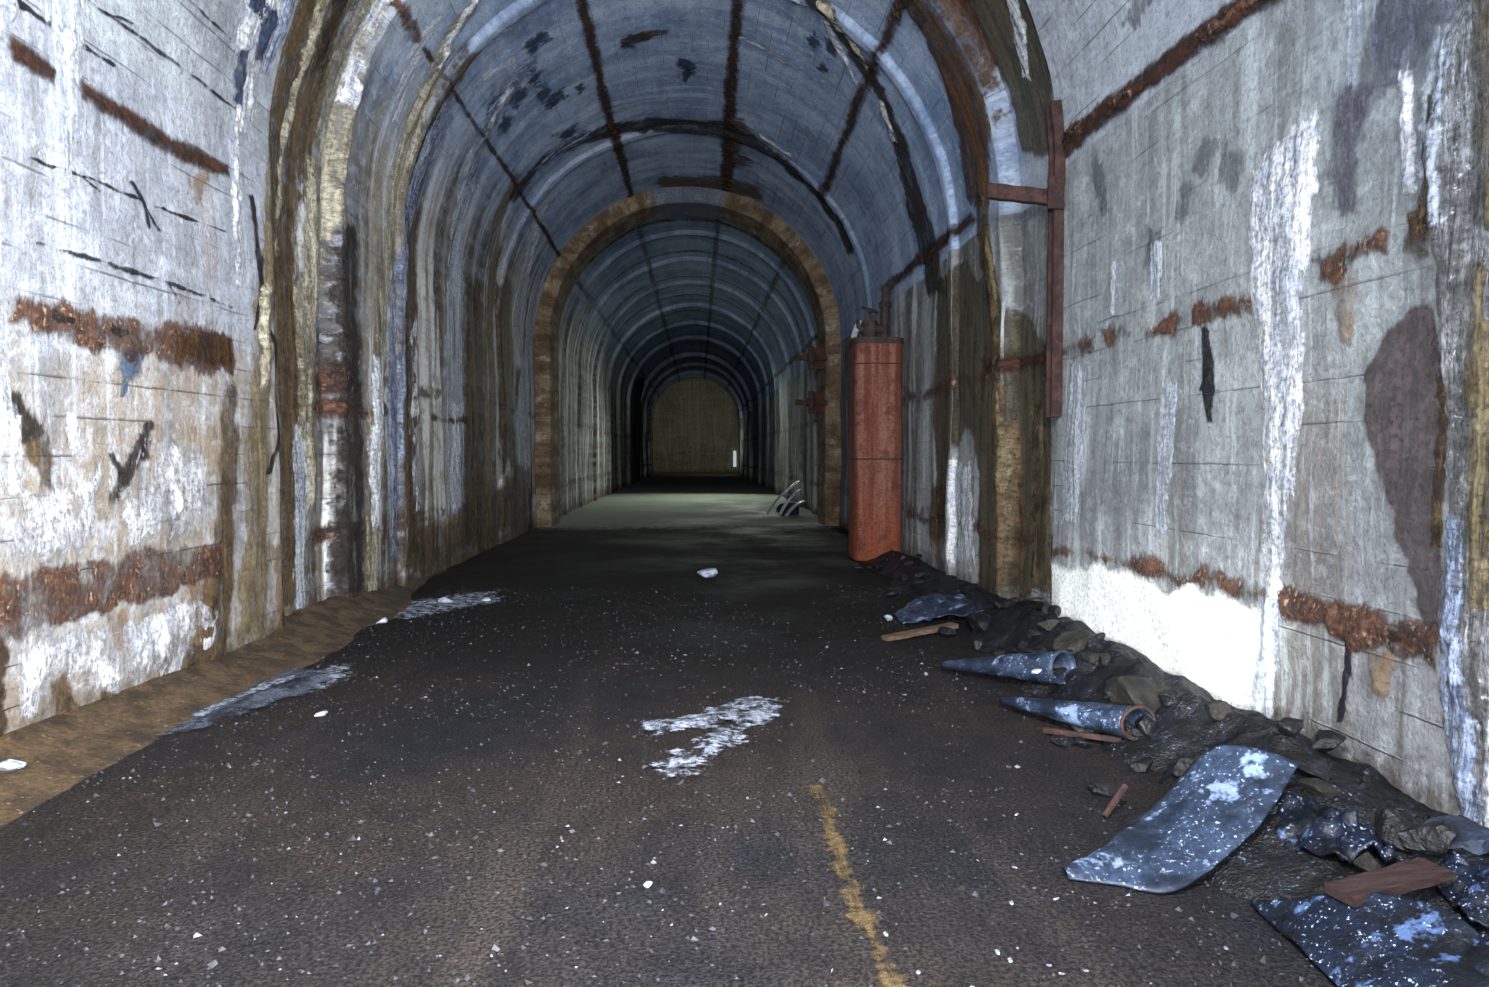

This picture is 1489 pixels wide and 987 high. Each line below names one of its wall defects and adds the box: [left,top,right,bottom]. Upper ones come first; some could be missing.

efflorescence [44,0,84,189]
efflorescence [0,307,15,458]
corrosion [9,297,236,376]
water stain [791,0,1086,597]
corrosion [904,296,1251,403]
water stain [1145,229,1163,301]
water stain [1154,381,1178,533]
water stain [1175,0,1489,719]
corrosion [1312,209,1429,341]
corrosion [0,542,224,651]
corrosion [907,507,1440,698]
water stain [1364,261,1489,828]